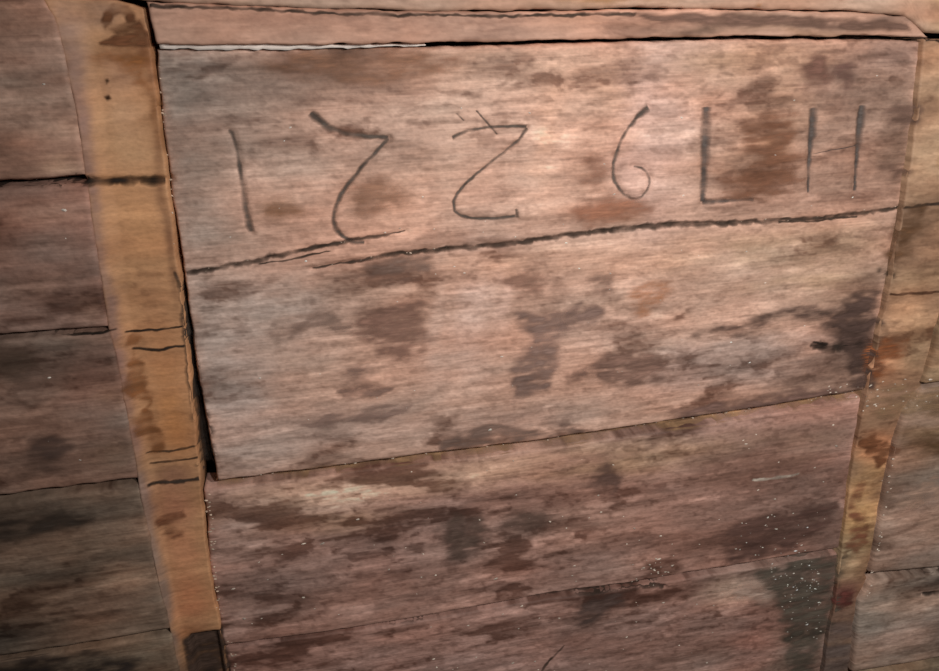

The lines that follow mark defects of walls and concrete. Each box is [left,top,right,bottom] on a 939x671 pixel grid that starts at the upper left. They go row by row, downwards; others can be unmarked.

leakage [804,56,850,84]
leakage [736,115,799,199]
crack [68,202,939,486]
leakage [511,307,604,397]
leakage [573,354,667,385]
leakage [682,291,883,418]
leakage [440,425,541,450]
leakage [858,435,892,468]
leakage [846,490,868,551]
leakage [728,502,853,671]